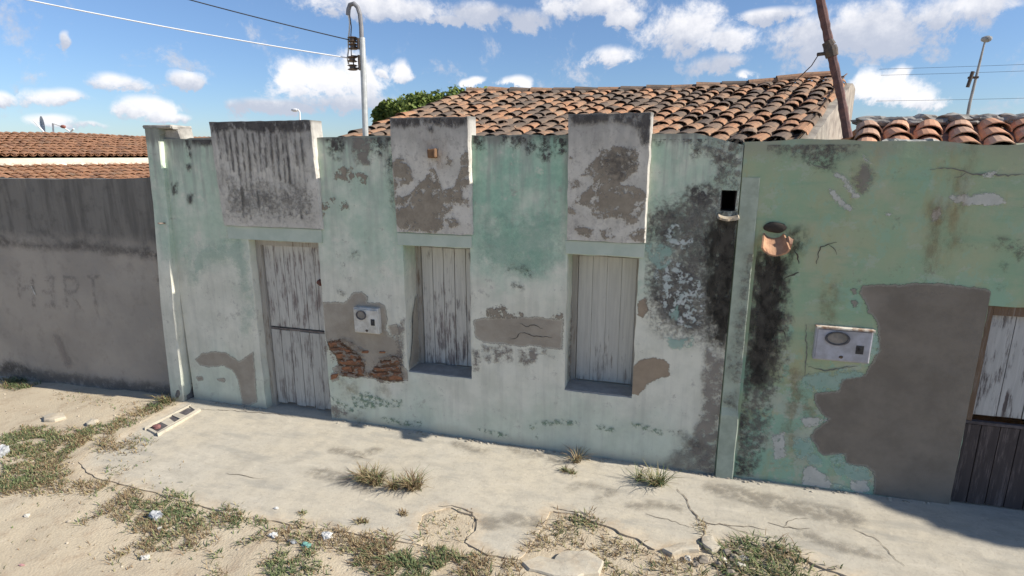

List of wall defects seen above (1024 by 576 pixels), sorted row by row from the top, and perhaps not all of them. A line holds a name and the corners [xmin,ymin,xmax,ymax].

leakage [185,121,311,218]
peeling [391,152,470,233]
peeling [323,292,420,383]
peeling [486,306,524,319]
leakage [568,113,799,475]
peeling [802,369,863,391]
peeling [772,417,872,495]